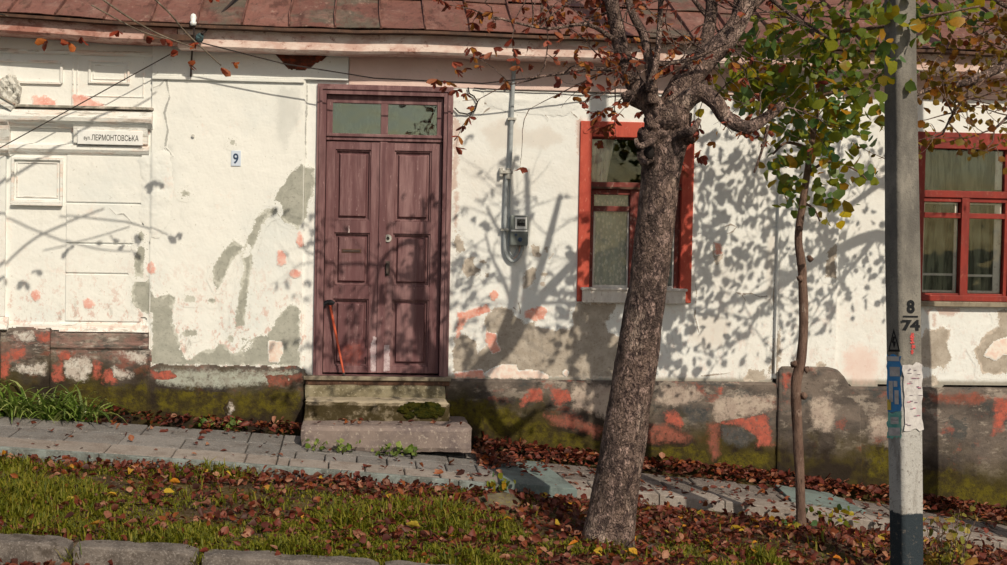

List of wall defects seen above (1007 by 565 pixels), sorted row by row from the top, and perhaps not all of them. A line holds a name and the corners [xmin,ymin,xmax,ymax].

spalling [1,157,316,417]
spalling [448,224,622,441]
water stain [678,401,756,451]
spalling [819,239,841,285]
spalling [921,307,1007,441]